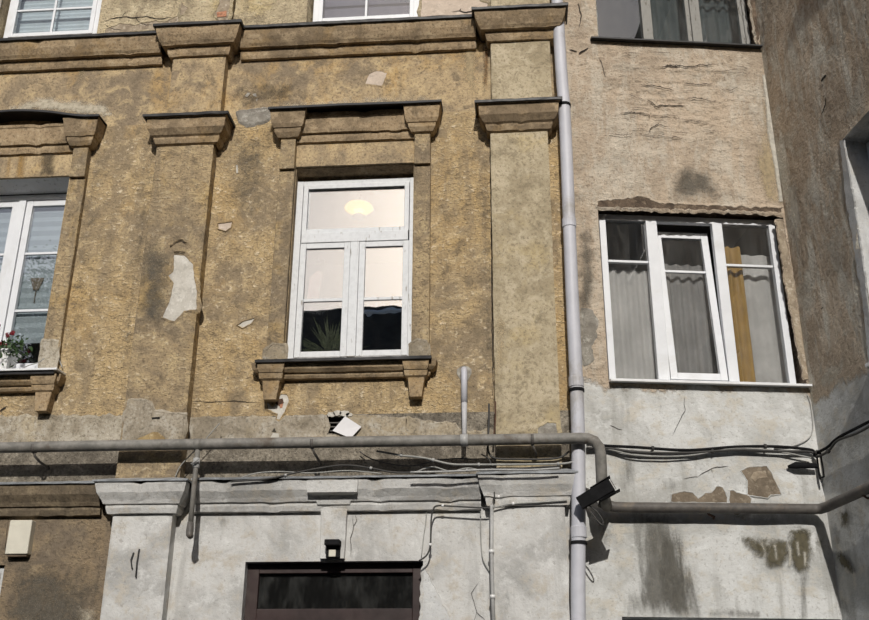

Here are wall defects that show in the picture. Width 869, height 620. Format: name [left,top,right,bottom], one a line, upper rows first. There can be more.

crack [103,11,168,30]
spalling [212,0,234,20]
peeling [417,0,491,17]
leakage [677,171,713,194]
peeling [160,253,202,324]
peeling [0,391,491,442]
peeling [670,465,782,503]
leakage [642,518,696,612]